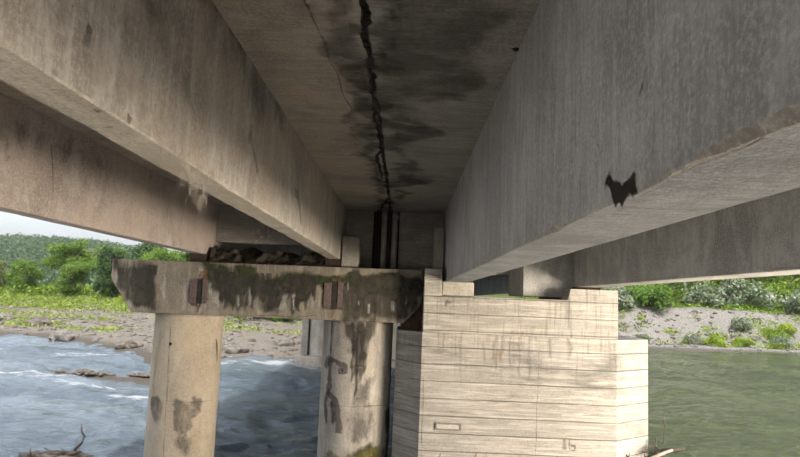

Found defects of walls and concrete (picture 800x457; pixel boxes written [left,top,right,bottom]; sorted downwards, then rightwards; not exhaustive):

crack [356,0,391,211]
leakage [113,255,165,310]
leakage [208,270,317,315]
leakage [338,270,421,400]
leakage [174,400,188,452]
leakage [353,415,372,442]